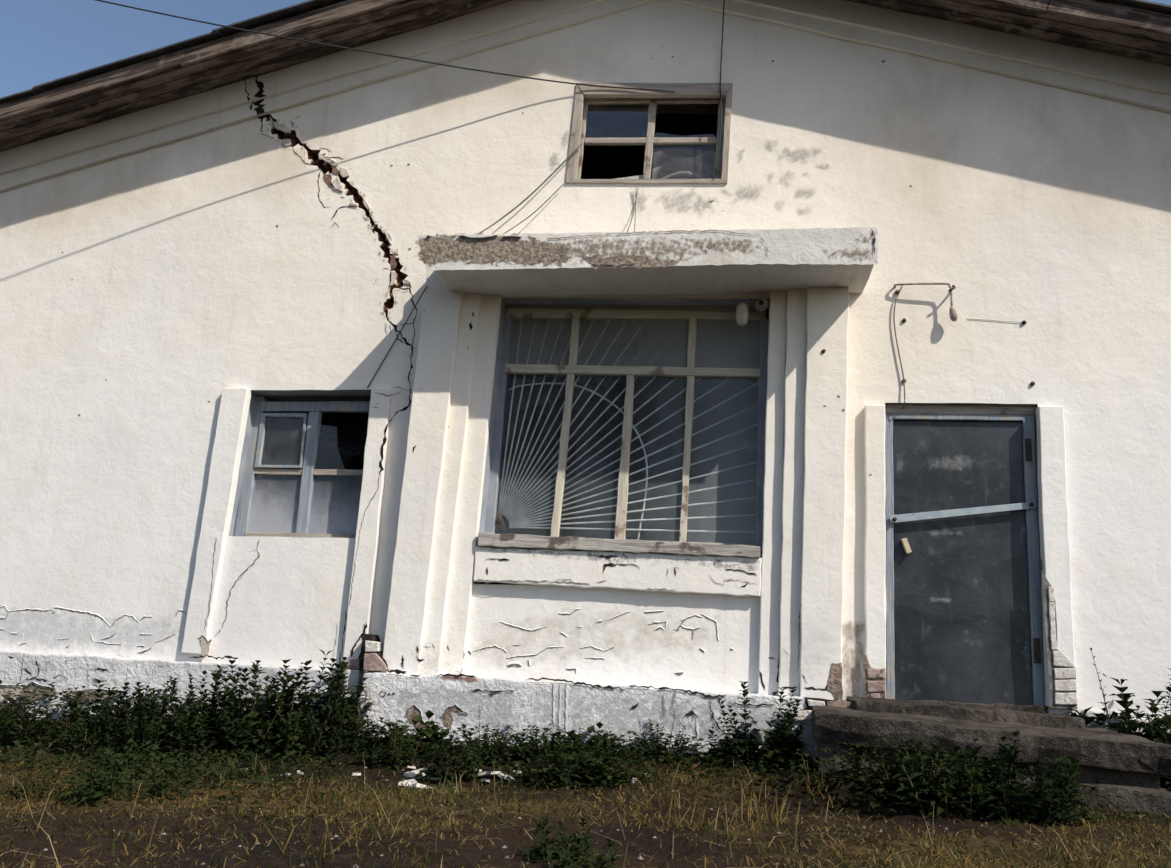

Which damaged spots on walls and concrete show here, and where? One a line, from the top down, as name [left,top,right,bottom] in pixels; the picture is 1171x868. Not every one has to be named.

spalling [408,232,761,269]
peeling [824,232,876,260]
crack [244,76,425,606]
peeling [0,604,176,653]
crack [190,539,260,660]
flaking render [1043,574,1077,709]
spalling [791,663,852,721]
flaking render [863,654,886,699]